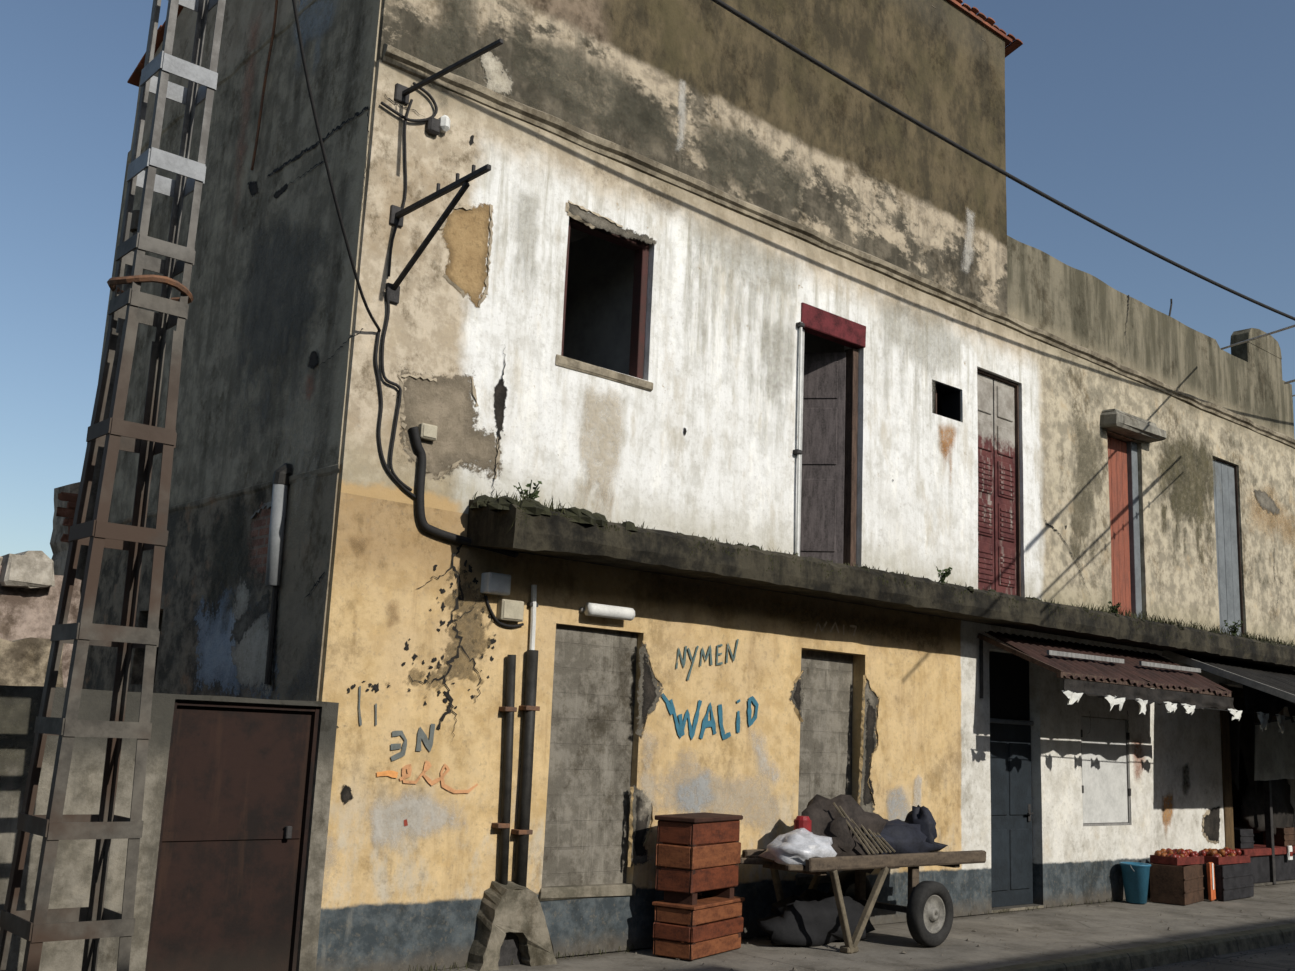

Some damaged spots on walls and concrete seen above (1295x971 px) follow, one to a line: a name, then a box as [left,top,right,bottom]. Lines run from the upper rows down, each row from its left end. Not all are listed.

damp [515,35,685,148]
damp [700,125,805,206]
peeling [440,203,493,308]
damp [965,213,973,270]
peeling [396,367,505,481]
peeling [194,501,280,699]
crack [409,544,485,740]
flaking render [1201,806,1220,844]